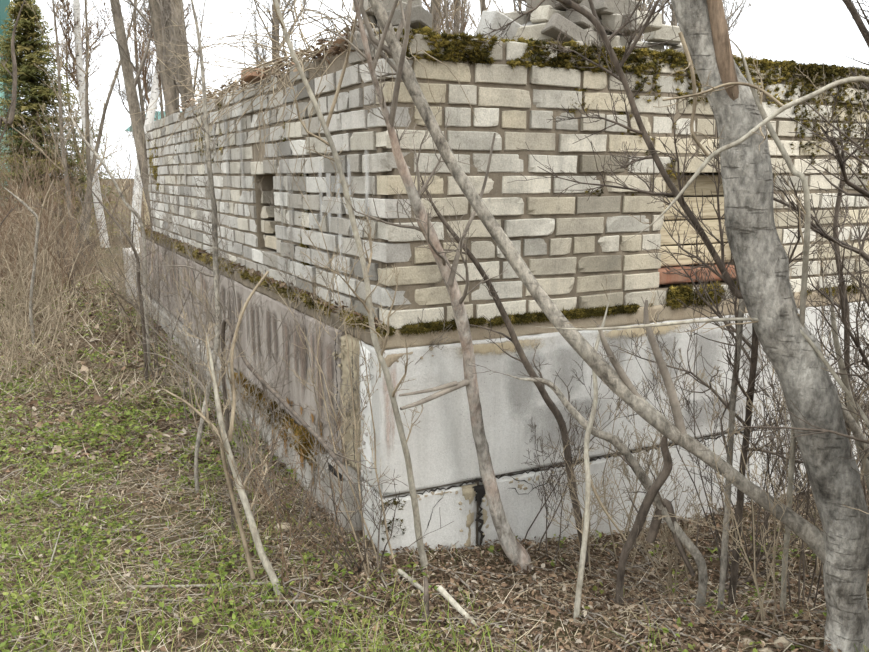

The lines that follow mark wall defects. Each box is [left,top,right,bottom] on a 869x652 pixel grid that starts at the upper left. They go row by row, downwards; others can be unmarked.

leakage [147,254,332,414]
spalling [417,483,489,548]